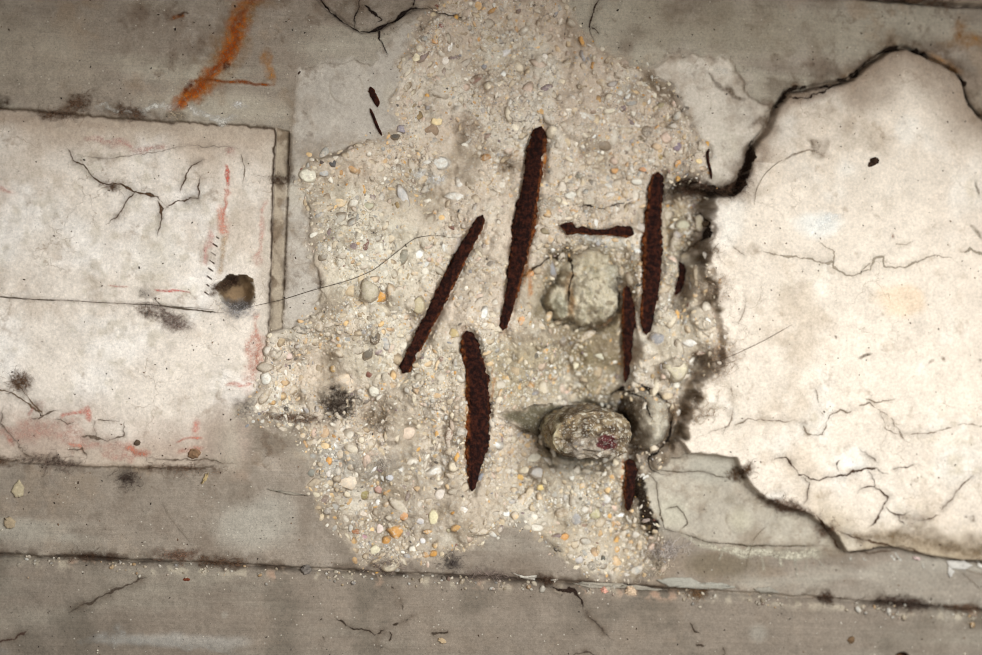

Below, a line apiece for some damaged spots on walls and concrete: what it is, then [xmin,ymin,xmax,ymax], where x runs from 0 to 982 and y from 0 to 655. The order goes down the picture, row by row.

rust [178,0,274,108]
crack [321,0,461,53]
crack [672,40,982,255]
crack [70,152,200,231]
crack [0,296,216,313]
spalling [234,0,843,591]
crack [770,244,982,276]
crack [0,386,125,456]
crack [728,391,982,440]
crack [610,382,804,547]
crack [775,453,981,563]